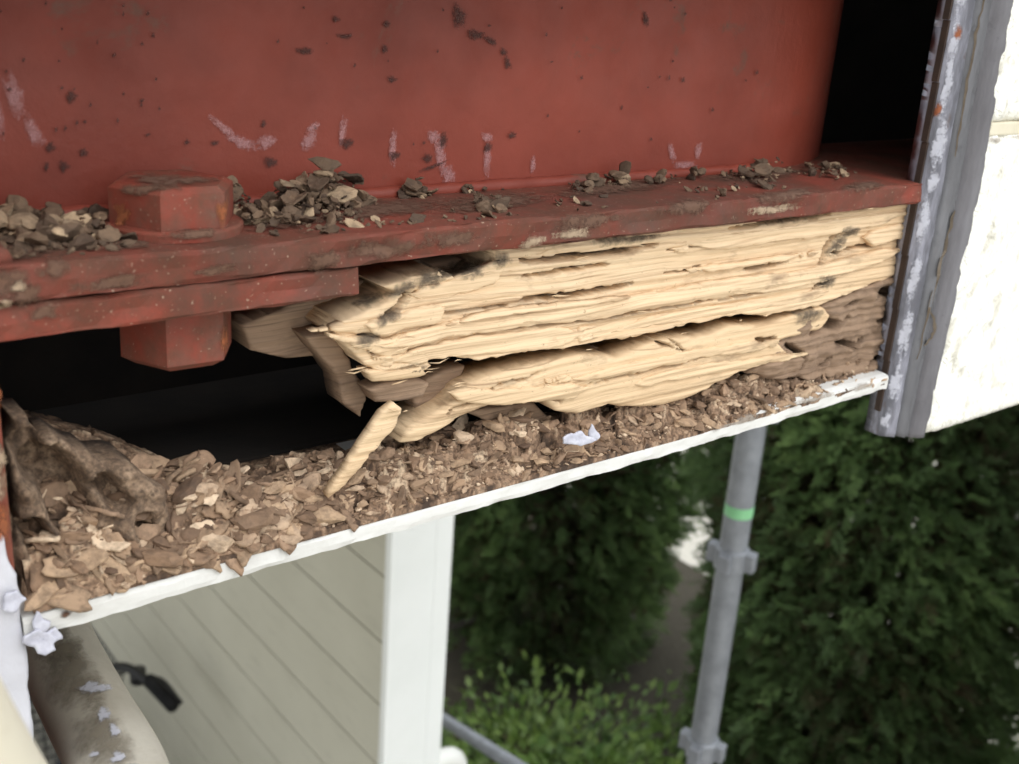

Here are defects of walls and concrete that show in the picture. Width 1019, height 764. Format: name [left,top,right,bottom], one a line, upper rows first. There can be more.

peeling [0,449,8,496]